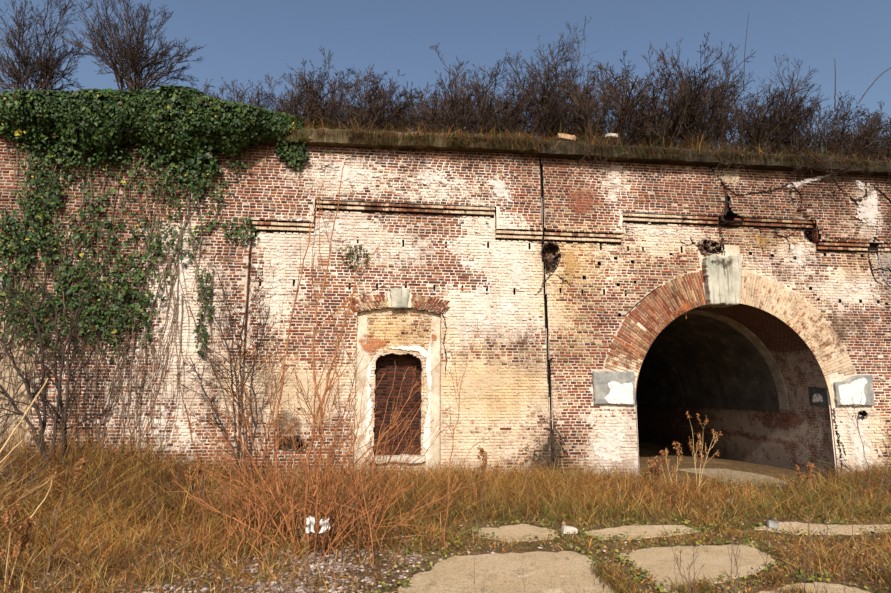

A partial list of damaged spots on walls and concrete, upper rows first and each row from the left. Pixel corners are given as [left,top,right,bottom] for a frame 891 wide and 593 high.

spalling [540,241,561,276]
spalling [620,222,724,256]
crack [709,166,891,286]
spalling [855,181,879,226]
spalling [605,381,633,404]
spalling [838,378,880,471]